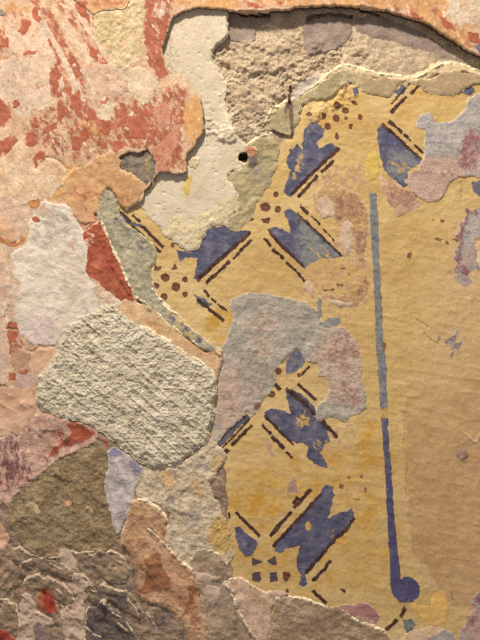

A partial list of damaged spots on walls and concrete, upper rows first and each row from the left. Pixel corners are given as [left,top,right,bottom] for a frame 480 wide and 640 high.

peeling [0,0,480,391]
flaking render [0,292,393,640]